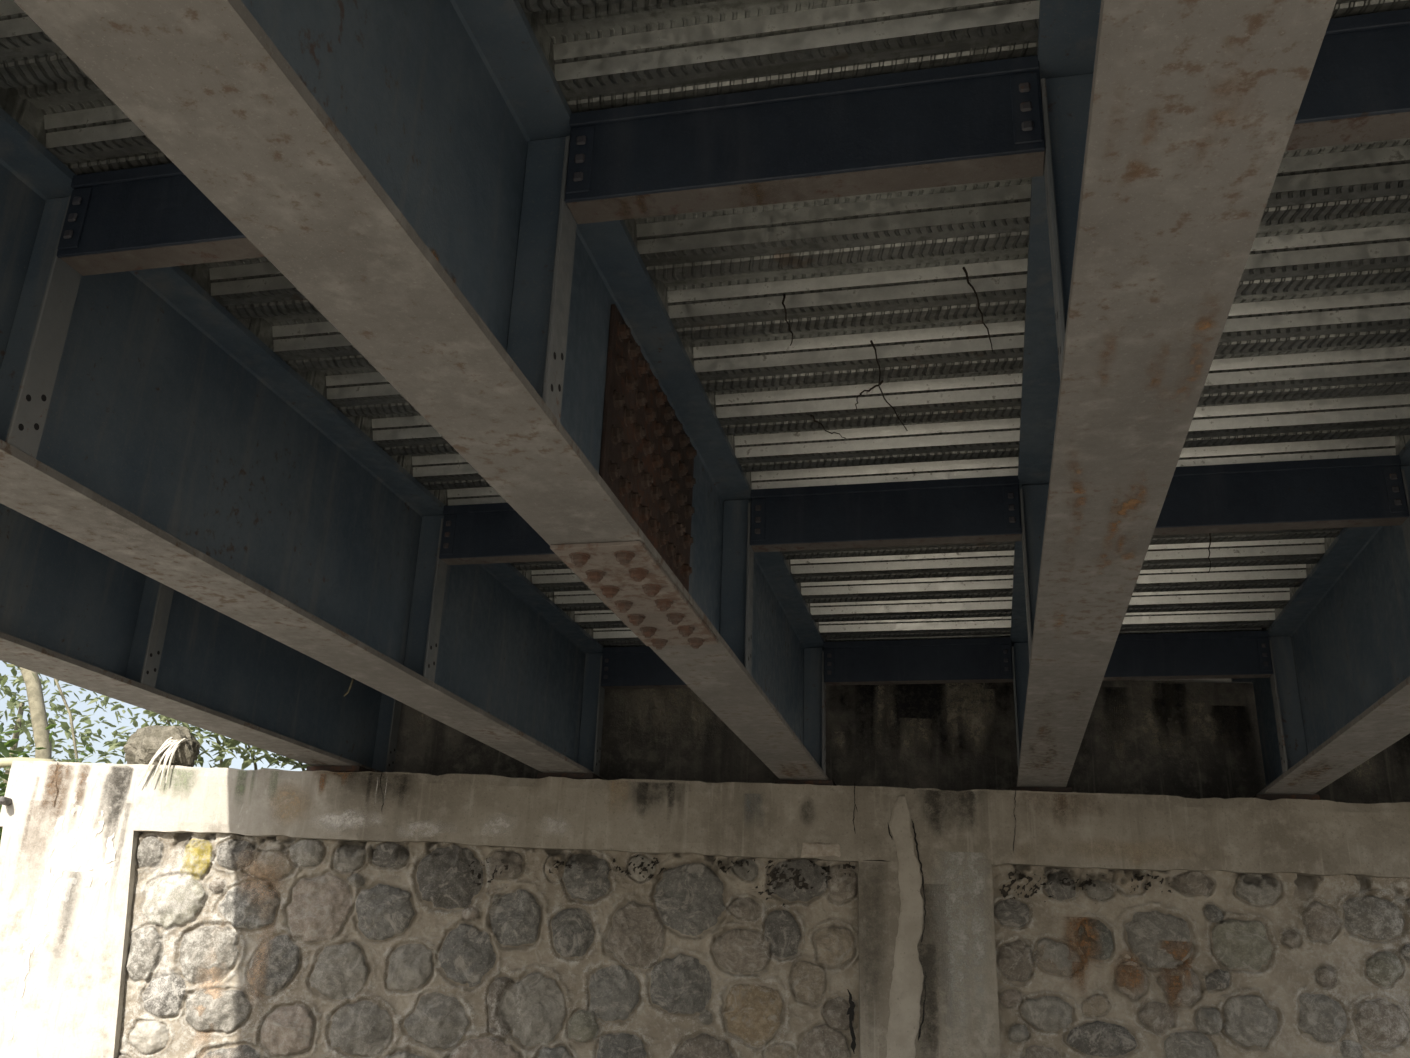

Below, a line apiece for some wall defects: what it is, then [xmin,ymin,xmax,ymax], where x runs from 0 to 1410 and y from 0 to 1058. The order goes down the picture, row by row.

leakage [832,682,1014,754]
leakage [42,765,89,815]
leakage [105,766,133,829]
crack [853,785,927,1041]
crack [847,989,856,1054]